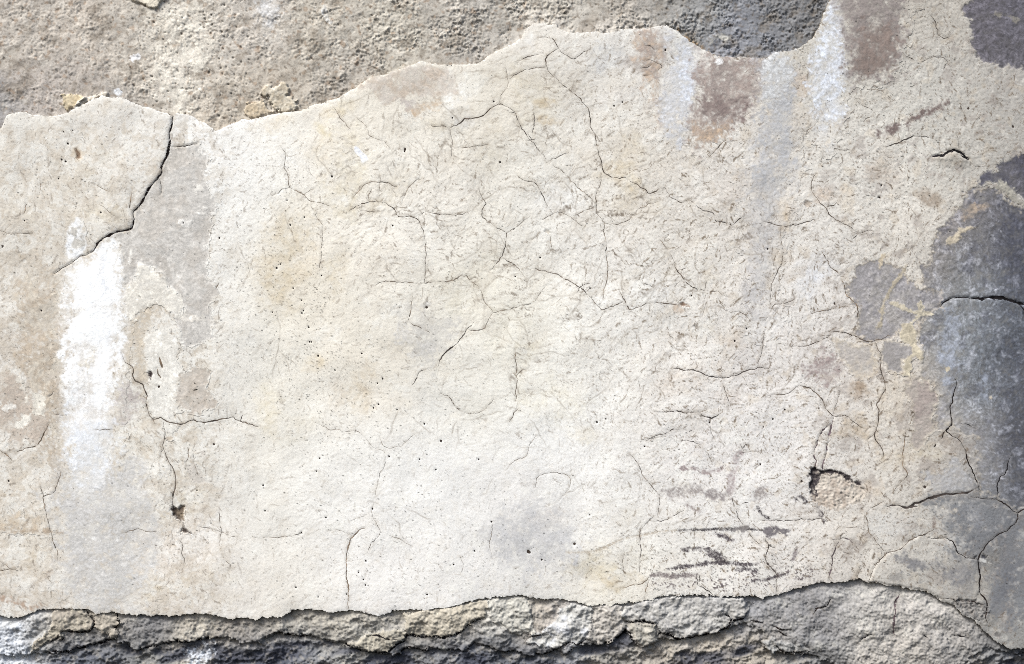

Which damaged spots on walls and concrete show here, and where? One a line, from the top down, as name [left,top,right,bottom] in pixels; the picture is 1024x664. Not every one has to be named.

peeling [60,91,110,112]
crack [57,117,197,272]
peeling [244,81,299,118]
leakage [641,25,698,157]
leakage [730,5,855,347]
crack [279,37,1024,621]
peeling [830,152,1024,515]
crack [122,356,258,567]
flaking render [0,578,1024,664]
spalling [804,466,867,513]
crack [861,594,900,640]
leakage [889,453,1024,644]